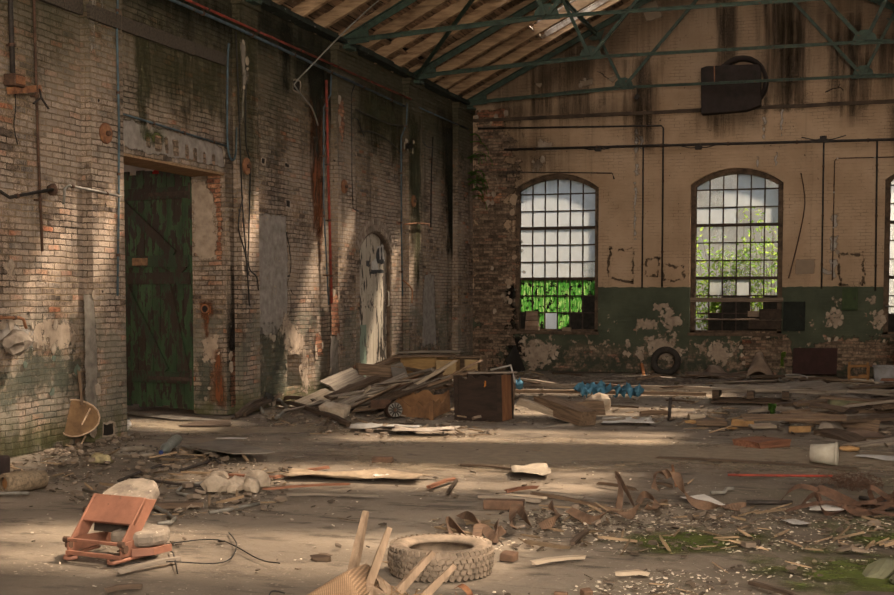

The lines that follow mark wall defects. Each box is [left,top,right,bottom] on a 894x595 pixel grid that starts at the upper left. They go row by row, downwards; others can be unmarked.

rust [310,92,323,262]
peeling [0,334,82,413]
peeling [622,303,793,370]
peeling [813,295,894,370]